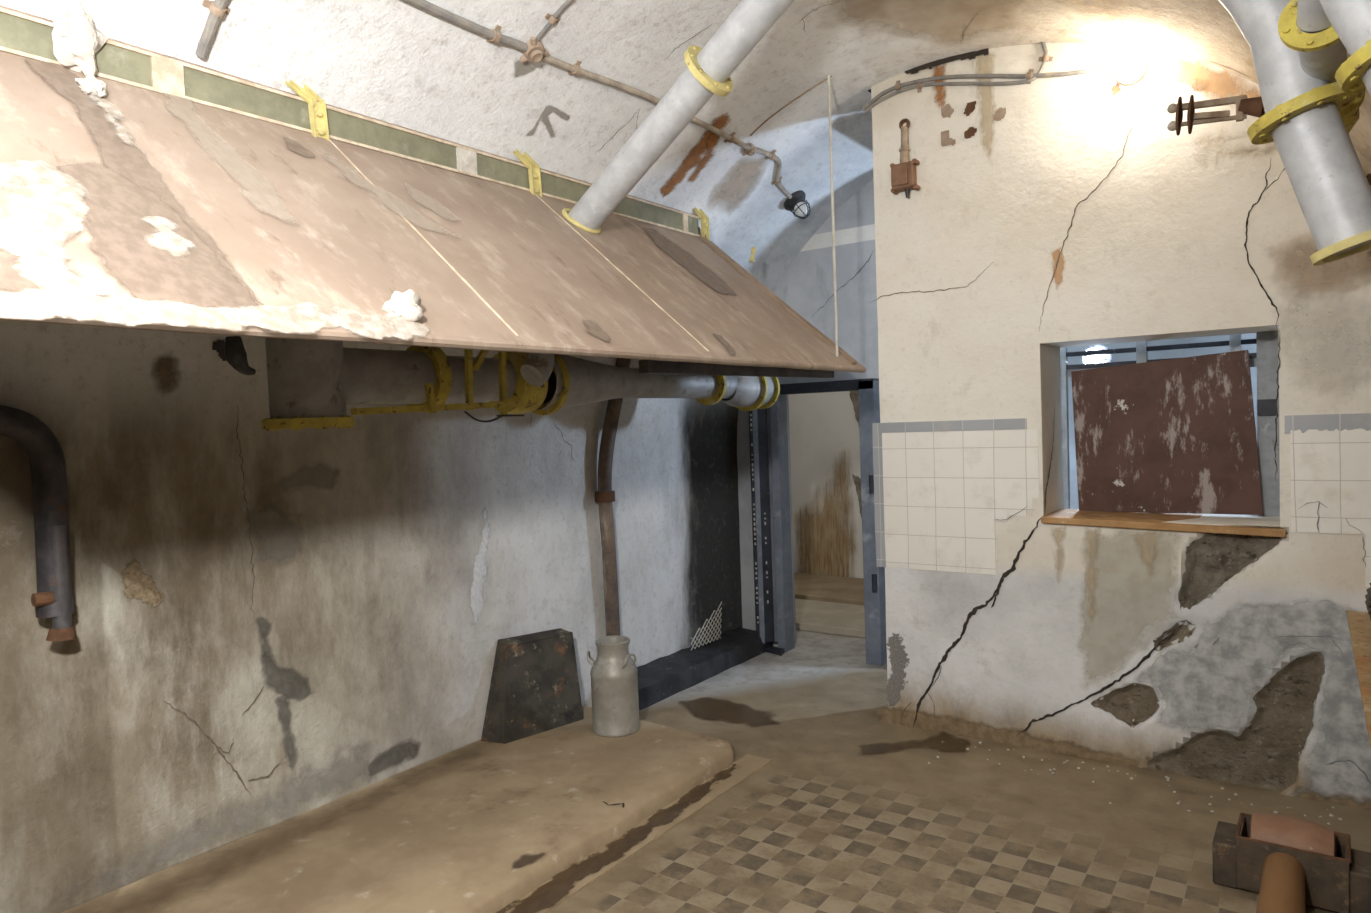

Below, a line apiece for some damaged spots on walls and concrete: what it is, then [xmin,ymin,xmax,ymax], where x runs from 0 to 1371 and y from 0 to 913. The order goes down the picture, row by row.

rust [661,115,729,197]
crack [1039,80,1160,331]
crack [1244,160,1285,480]
crack [900,408,1055,727]
flaking render [1153,526,1288,651]
leakage [680,697,778,726]
peeling [886,633,910,706]
leakage [860,708,1139,768]
crack [1016,622,1220,736]
flaking render [1091,683,1159,728]
flaking render [1144,652,1325,794]
leakage [1296,791,1371,810]